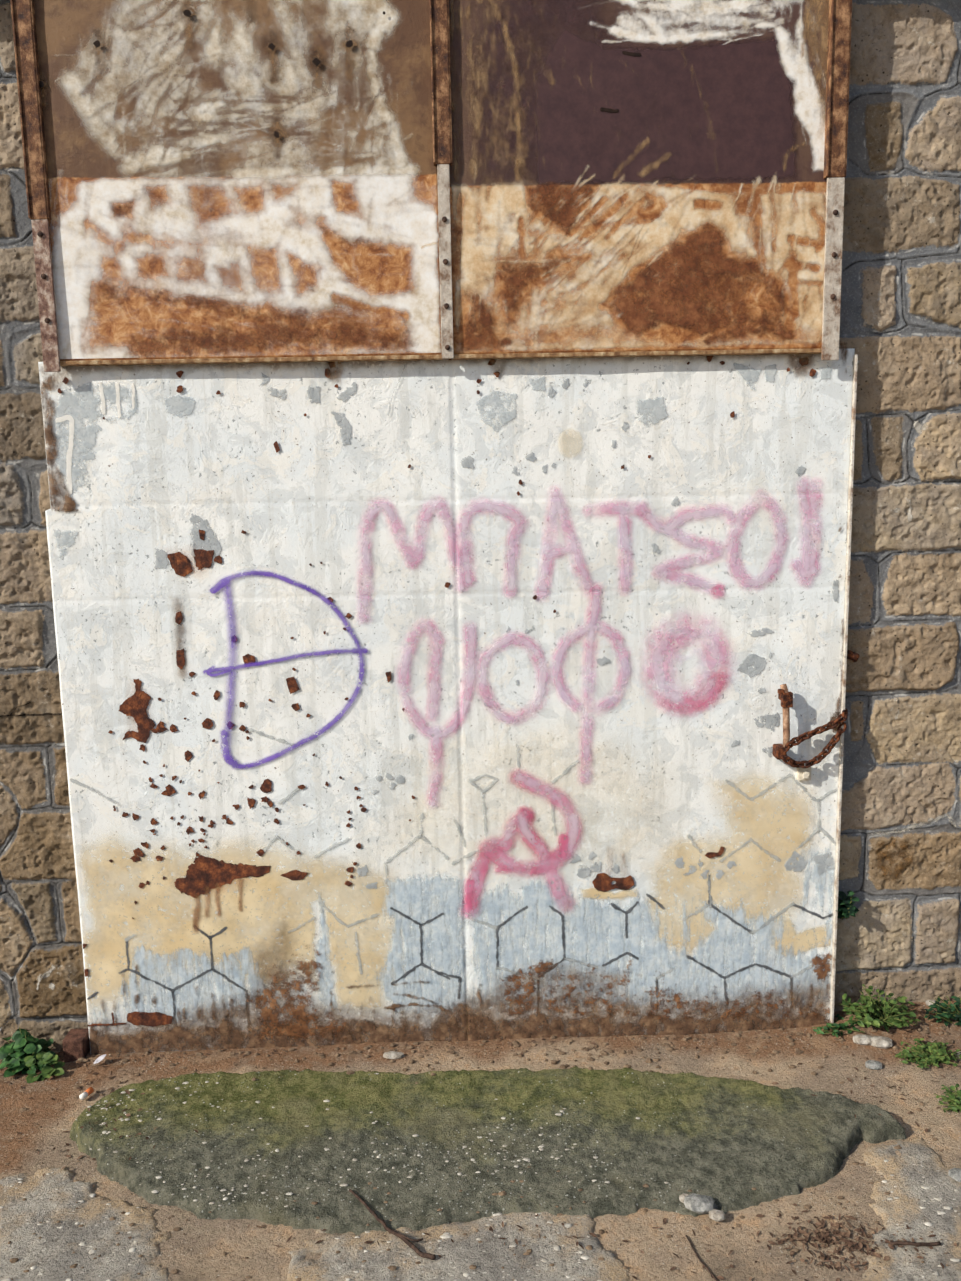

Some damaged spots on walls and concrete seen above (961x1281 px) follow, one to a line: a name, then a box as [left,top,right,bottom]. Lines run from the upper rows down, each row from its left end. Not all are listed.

peeling [603,0,825,170]
peeling [52,0,451,360]
peeling [452,177,831,389]
rust [613,224,815,374]
peeling [55,377,138,495]
peeling [304,362,357,445]
peeling [476,359,517,431]
rust [167,529,222,577]
rust [119,679,178,752]
rust [772,684,793,760]
rust [174,855,308,931]
rust [88,934,832,1055]